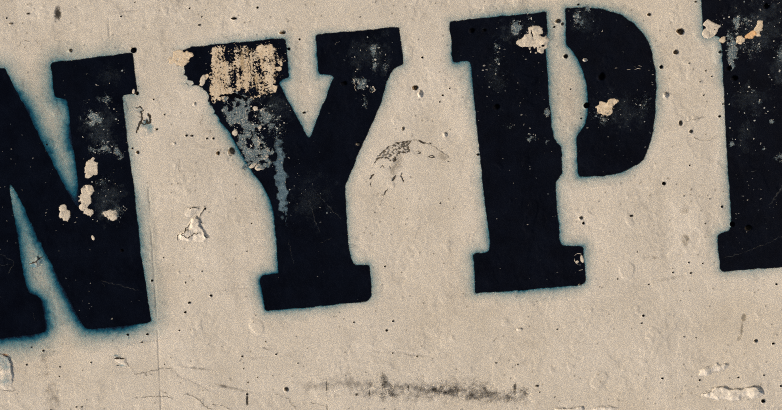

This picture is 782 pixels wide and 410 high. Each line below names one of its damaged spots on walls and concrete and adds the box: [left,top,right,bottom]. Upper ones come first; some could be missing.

peeling [702,19,726,53]
peeling [736,20,763,44]
peeling [200,42,290,116]
peeling [583,99,619,120]
peeling [59,157,98,221]
peeling [103,210,118,221]
spalling [179,207,208,245]
spalling [0,354,15,391]
spalling [699,363,729,381]
spalling [702,385,765,403]